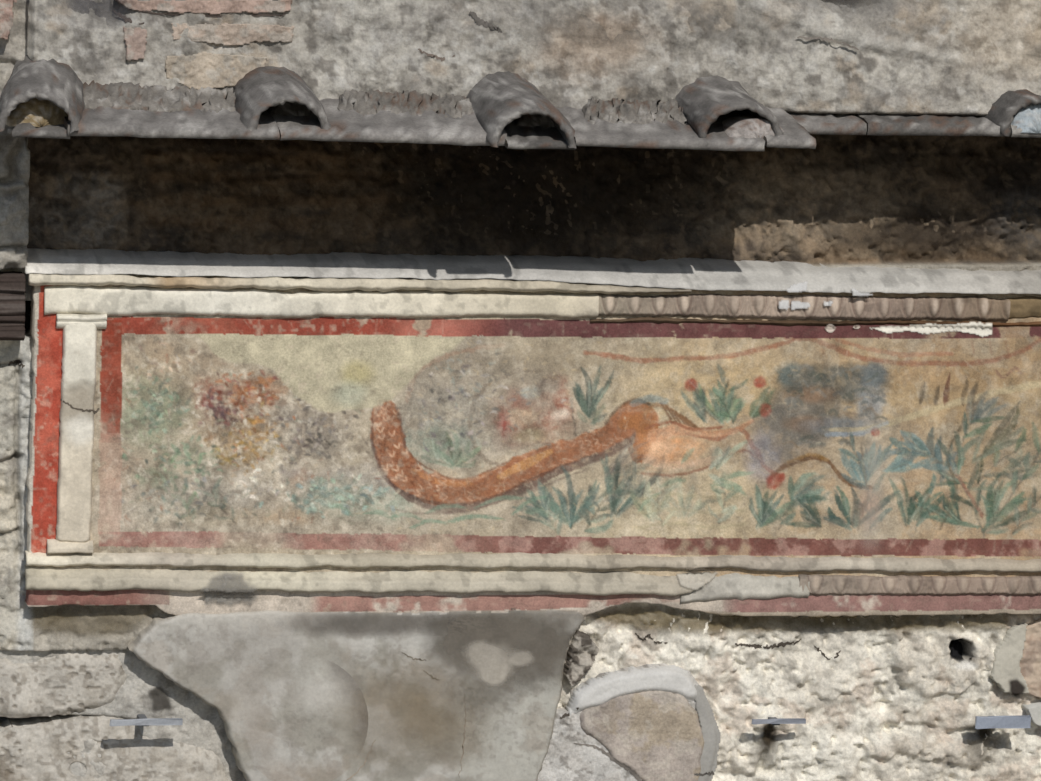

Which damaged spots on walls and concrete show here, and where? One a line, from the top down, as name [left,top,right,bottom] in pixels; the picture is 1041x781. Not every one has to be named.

flaking render [779,282,810,310]
peeling [873,322,992,337]
crack [60,399,99,413]
crack [735,639,841,660]
spalling [950,639,972,660]